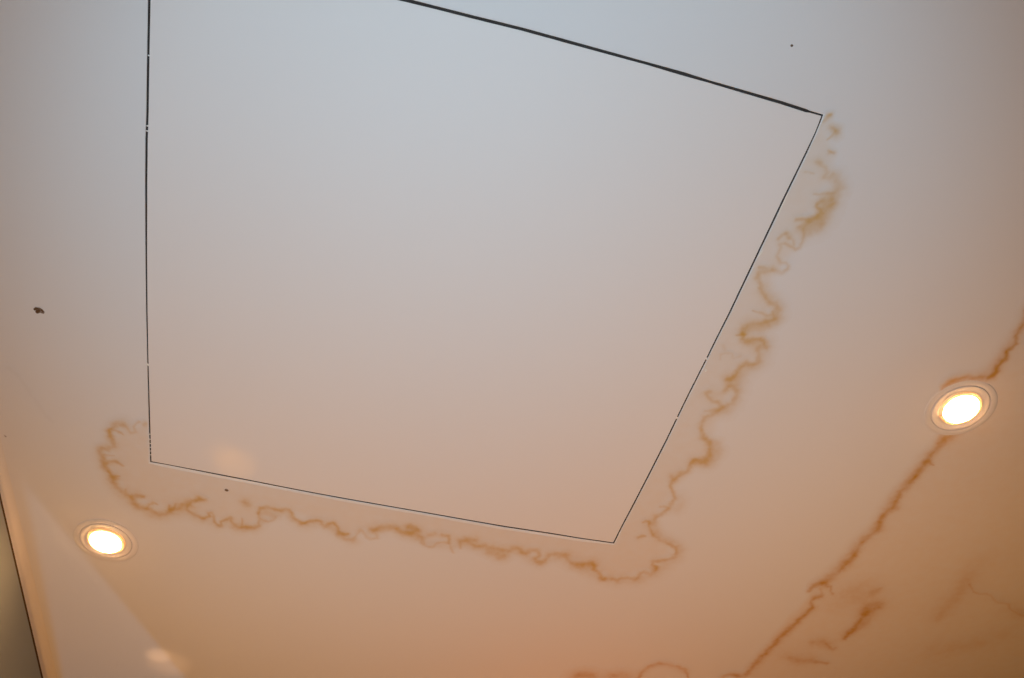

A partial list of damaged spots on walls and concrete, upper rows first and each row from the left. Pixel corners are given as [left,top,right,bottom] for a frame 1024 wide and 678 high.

damp [88,109,855,592]
damp [717,296,1024,678]